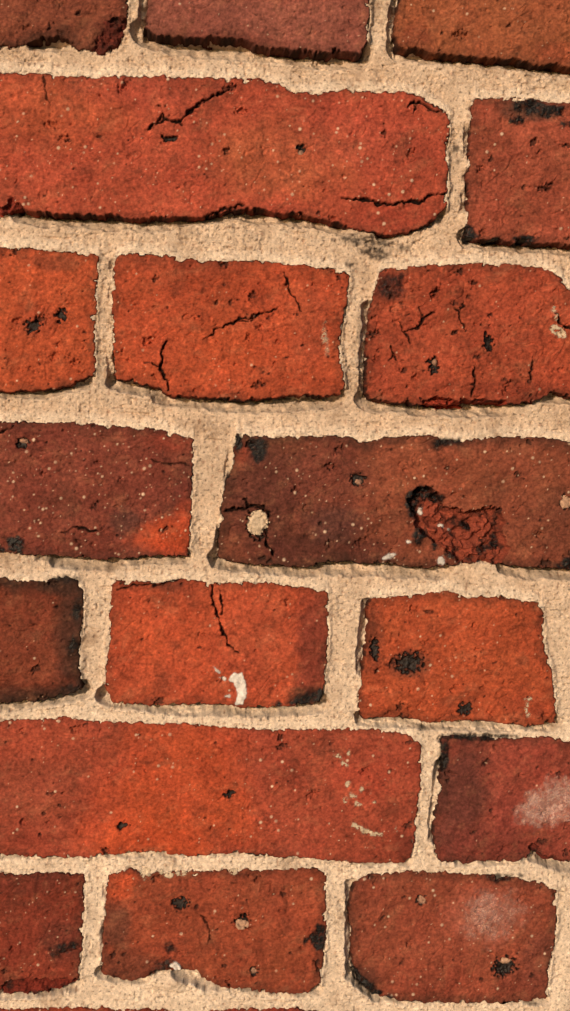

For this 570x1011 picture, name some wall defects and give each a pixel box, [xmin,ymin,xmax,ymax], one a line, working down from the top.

crack [148,89,230,130]
crack [341,193,445,207]
crack [207,277,302,338]
crack [152,341,169,391]
spalling [410,485,511,565]
crack [211,585,239,653]